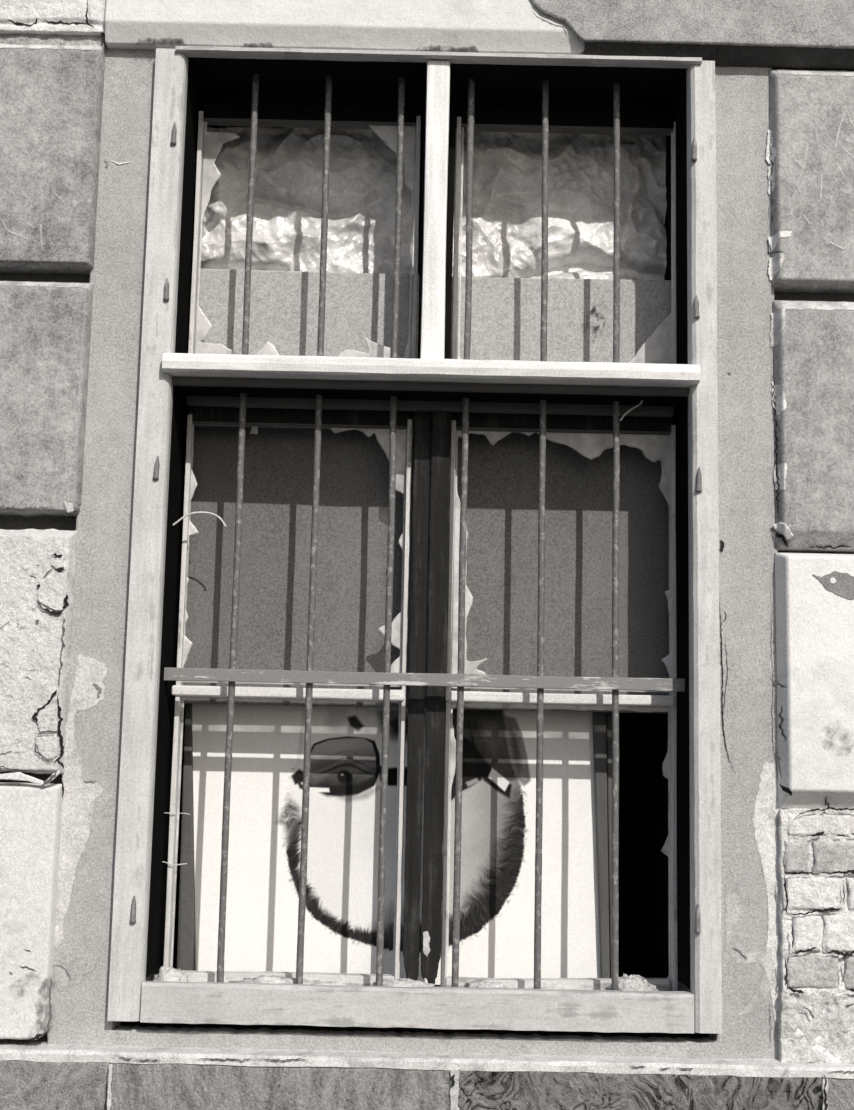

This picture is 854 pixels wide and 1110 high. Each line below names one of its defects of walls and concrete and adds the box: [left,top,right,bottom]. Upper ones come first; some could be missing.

flaking render [0,0,106,42]
peeling [0,964,71,1045]
peeling [0,553,107,949]
flaking render [725,571,854,1063]